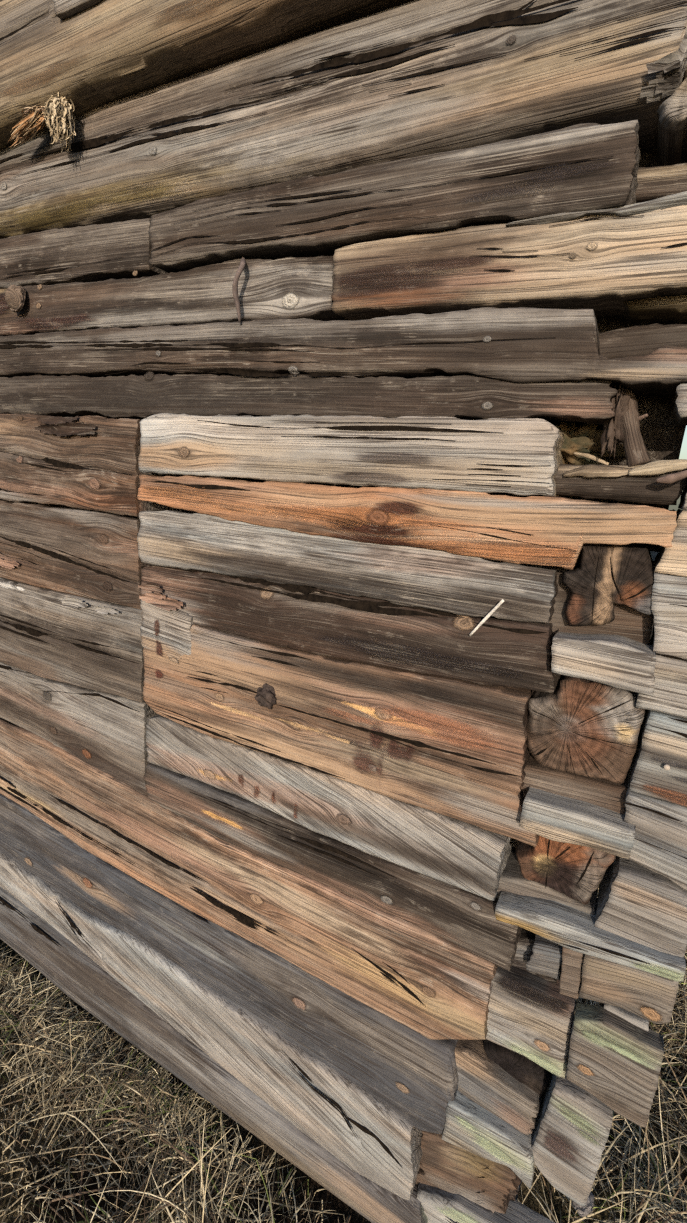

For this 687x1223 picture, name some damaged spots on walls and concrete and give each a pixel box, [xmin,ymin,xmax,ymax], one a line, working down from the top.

peeling [0,558,19,569]
crack [0,787,280,937]
crack [351,948,426,1007]
crack [280,1053,403,1169]